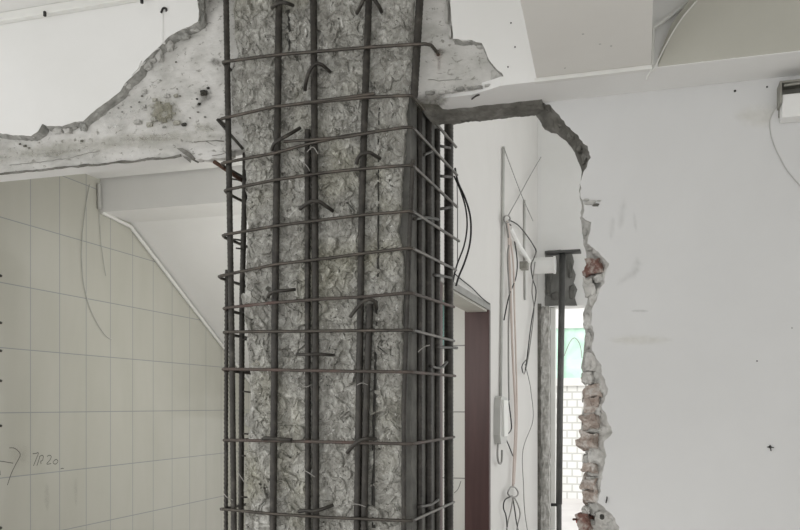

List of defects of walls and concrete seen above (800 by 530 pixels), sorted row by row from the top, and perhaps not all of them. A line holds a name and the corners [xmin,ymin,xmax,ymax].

flaking render [0,0,207,149]
spalling [231,0,415,530]